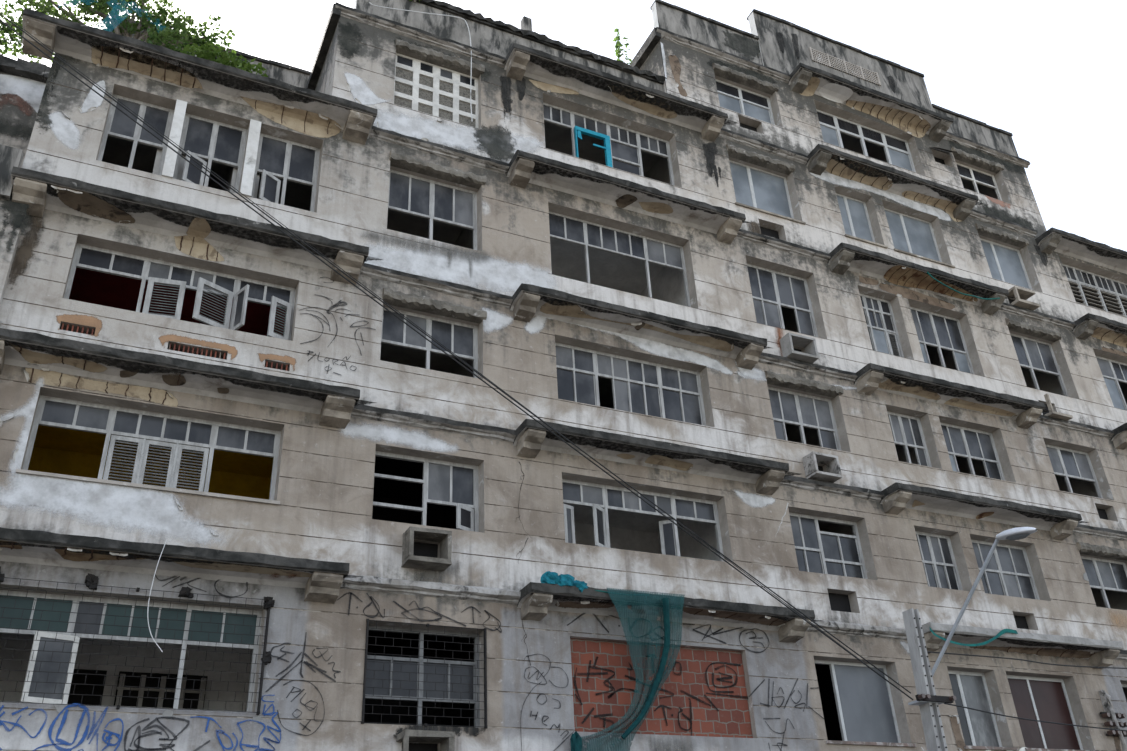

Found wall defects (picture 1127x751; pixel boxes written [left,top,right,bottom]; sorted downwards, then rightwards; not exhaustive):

flaking render [0,46,206,149]
flaking render [240,96,344,138]
damp [515,49,737,126]
flaking render [800,77,931,138]
damp [473,62,761,234]
damp [0,175,58,289]
flaking render [51,185,135,224]
flaking render [174,217,224,261]
damp [74,189,383,262]
damp [367,233,487,271]
damp [1055,233,1127,259]
flaking render [859,265,978,310]